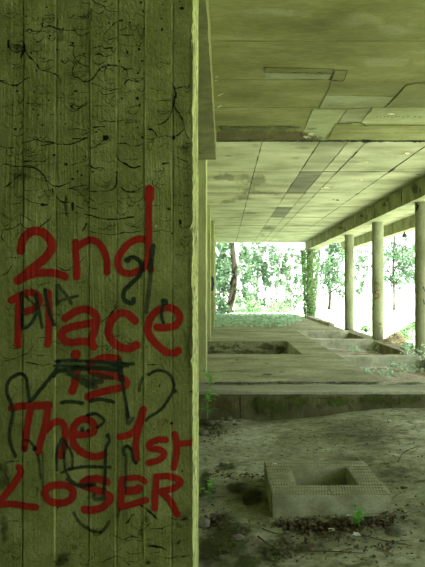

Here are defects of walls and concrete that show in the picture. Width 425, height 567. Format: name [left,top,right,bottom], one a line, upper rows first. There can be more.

crack [0,0,191,256]
crack [0,305,70,372]
crack [61,505,190,567]